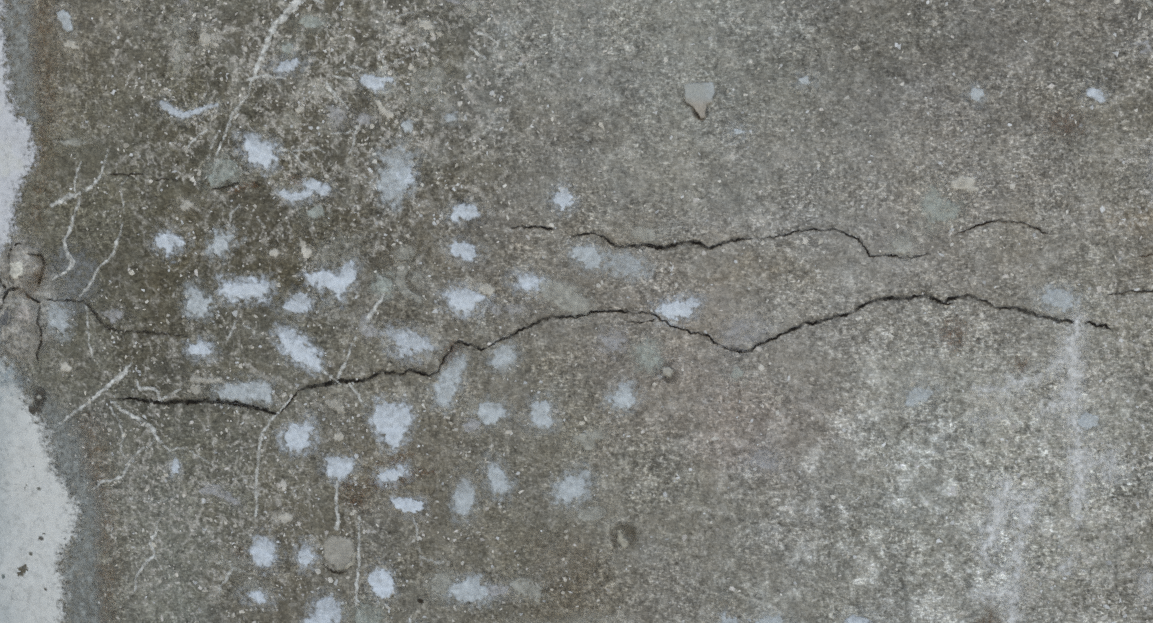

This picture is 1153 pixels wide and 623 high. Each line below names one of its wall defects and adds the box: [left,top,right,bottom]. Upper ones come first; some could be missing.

crack [512,225,928,259]
crack [958,220,1047,234]
crack [0,242,184,361]
crack [1109,288,1153,296]
crack [119,294,1111,415]